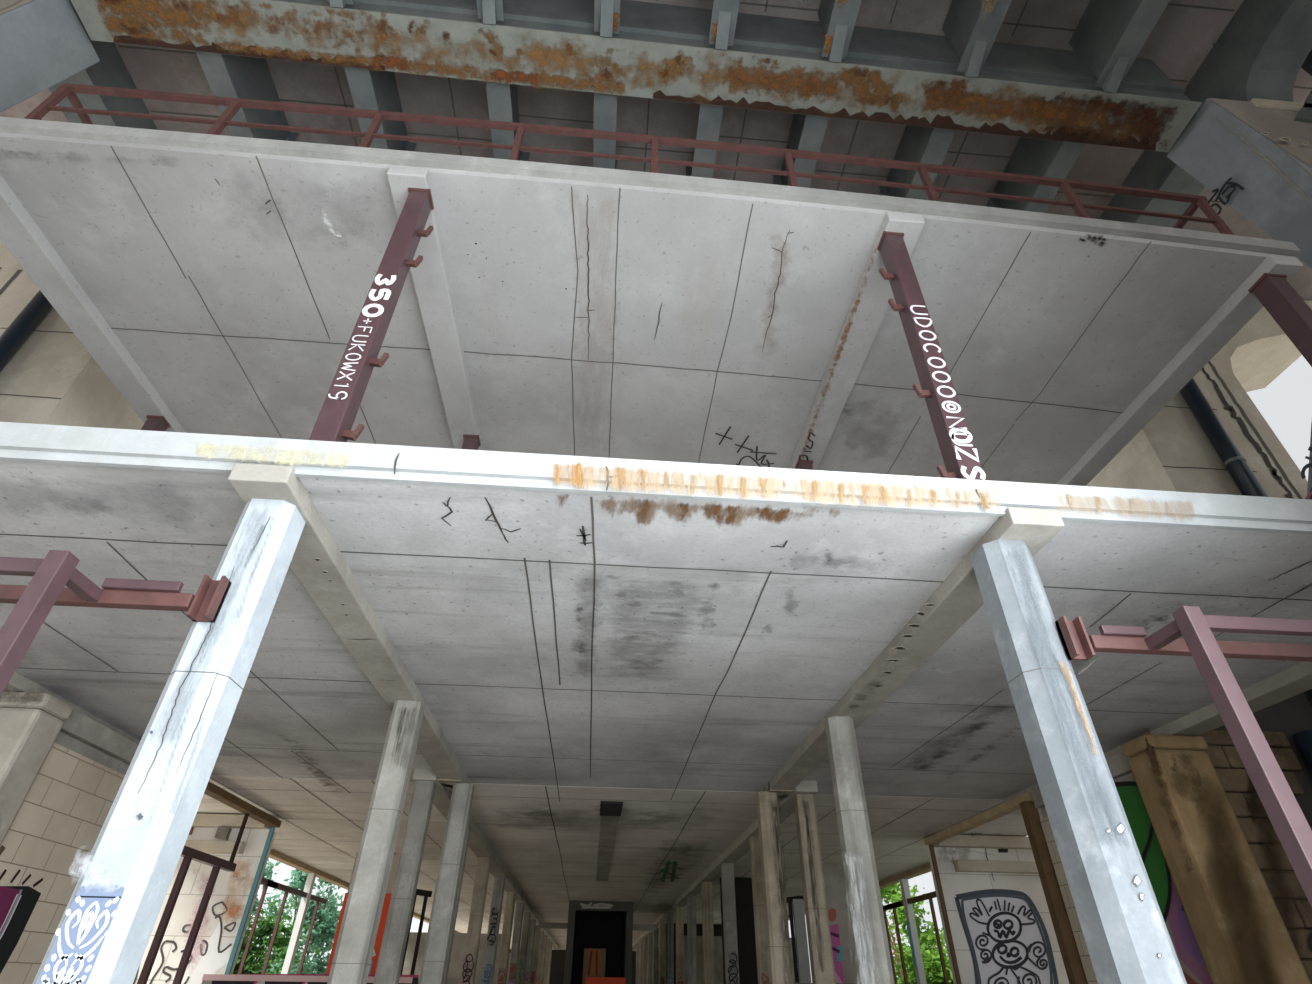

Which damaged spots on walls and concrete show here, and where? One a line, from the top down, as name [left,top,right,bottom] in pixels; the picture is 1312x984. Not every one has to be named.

corrosion [97,0,1177,151]
crack [762,230,794,352]
corrosion [822,251,876,396]
crack [441,497,453,526]
crack [484,497,521,543]
corrosion [555,464,996,524]